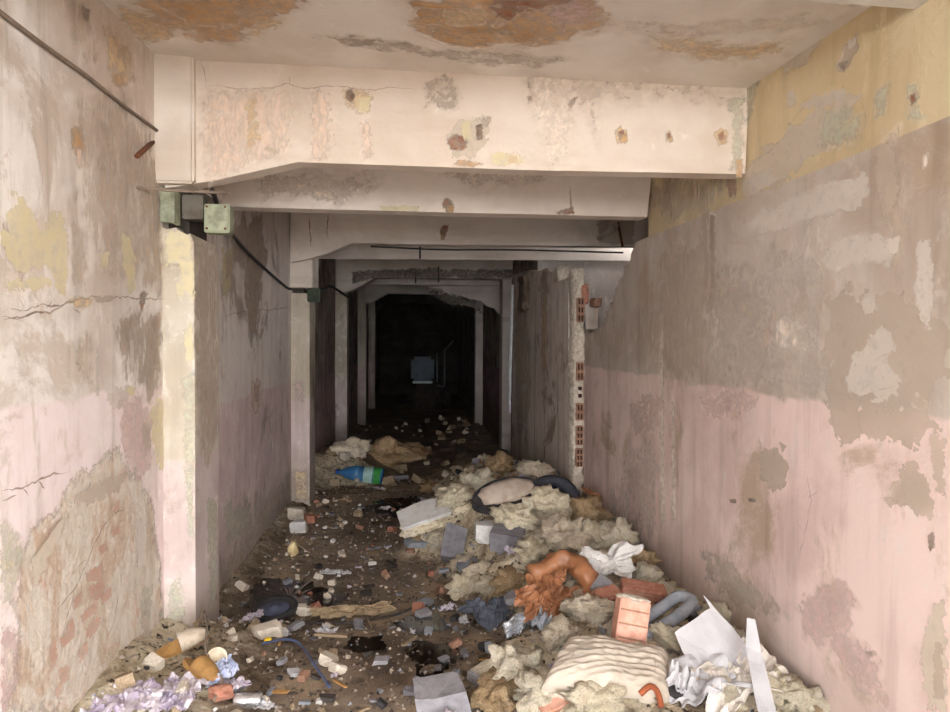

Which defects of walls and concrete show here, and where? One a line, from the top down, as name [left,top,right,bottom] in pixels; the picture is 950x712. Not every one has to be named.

peeling [836,33,859,72]
spalling [446,117,525,167]
rust [615,127,628,143]
peeling [1,190,114,307]
peeling [821,232,901,274]
crack [3,295,163,320]
peeling [820,239,950,551]
crack [3,472,66,501]
peeling [758,442,789,492]
spalling [1,347,164,712]